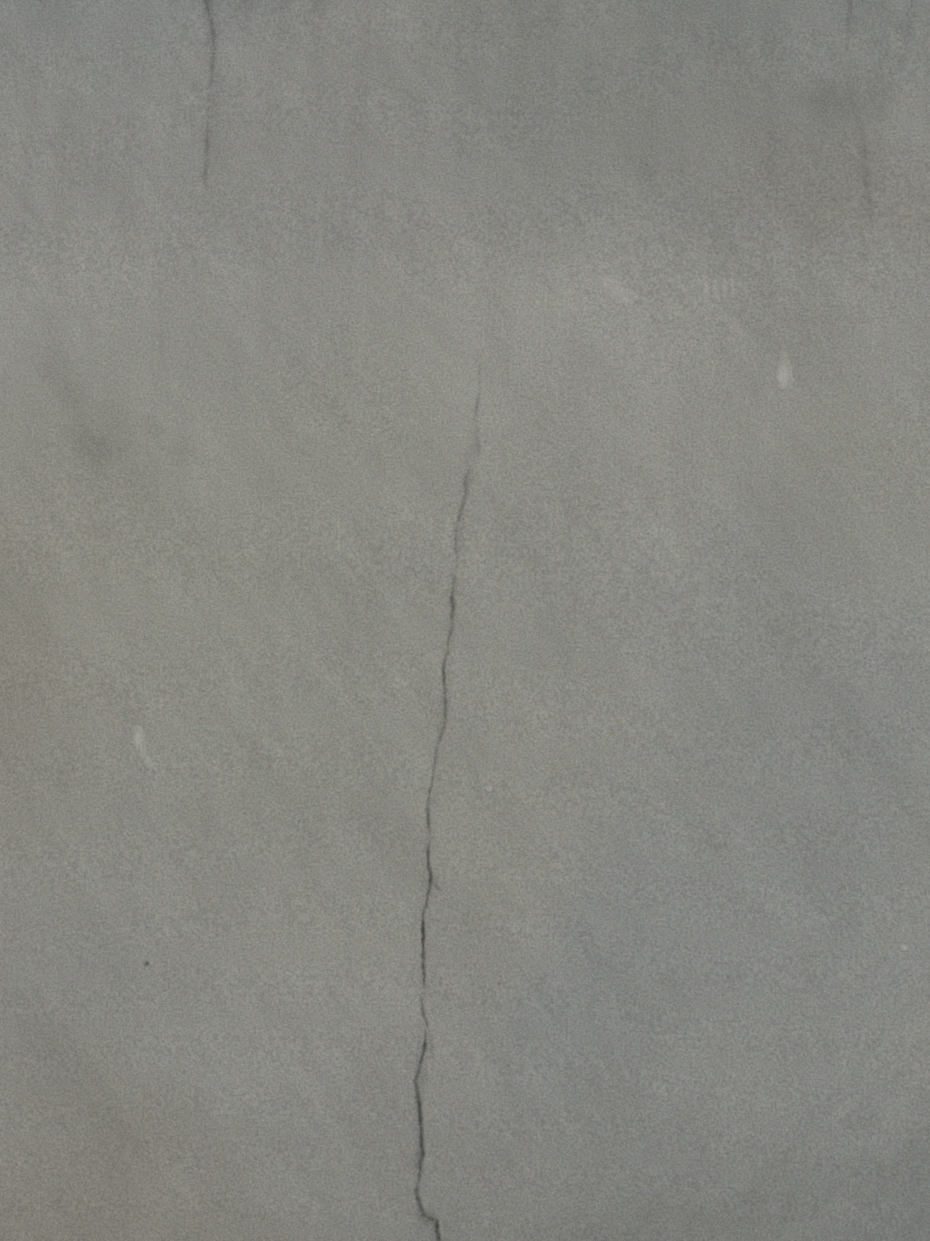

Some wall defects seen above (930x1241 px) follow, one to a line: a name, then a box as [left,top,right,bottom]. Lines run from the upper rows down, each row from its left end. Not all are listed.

crack [419,920,427,978]
crack [416,1040,427,1165]